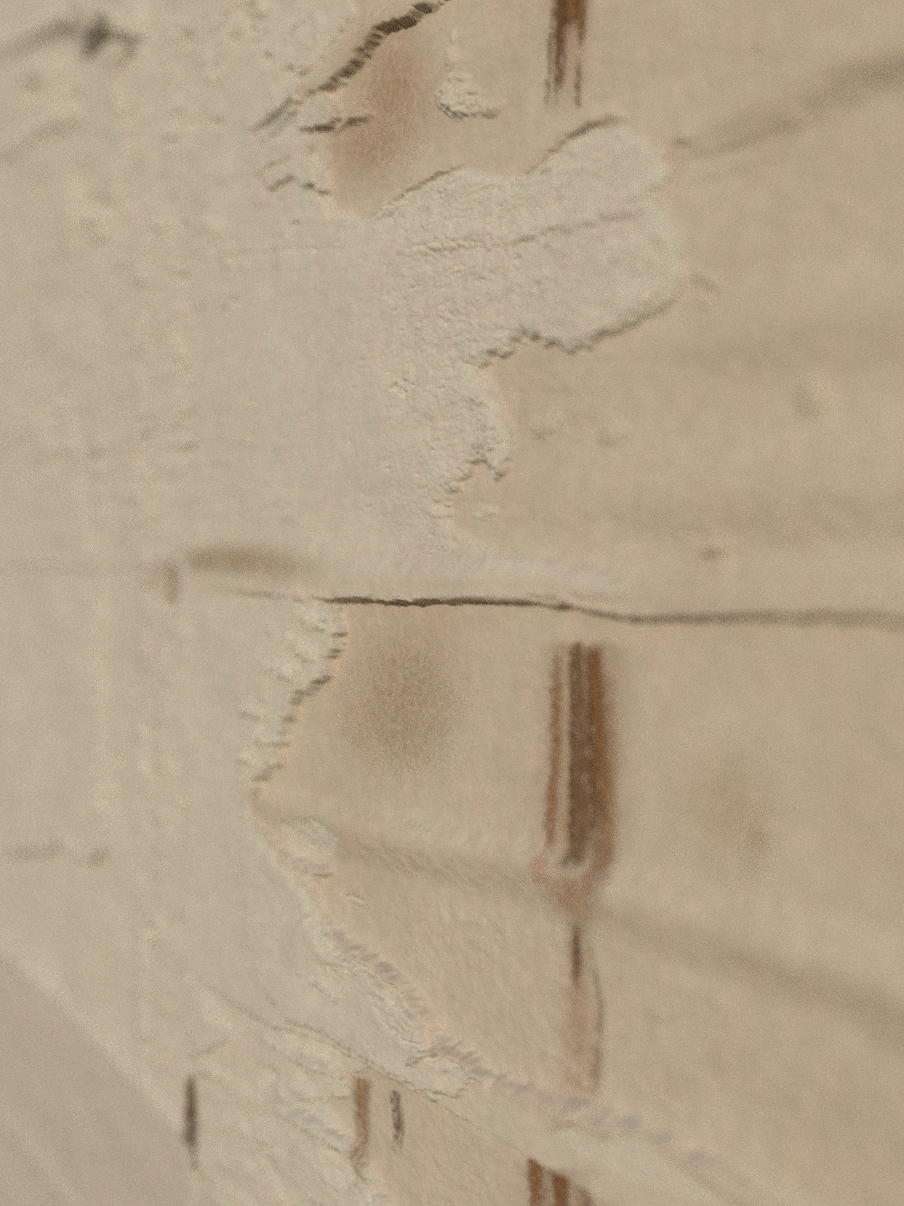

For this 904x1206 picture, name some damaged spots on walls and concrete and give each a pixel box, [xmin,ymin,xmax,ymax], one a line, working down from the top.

rust [554,0,586,102]
flaking render [182,89,692,559]
flaking render [235,589,352,800]
rust [546,644,611,879]
flaking render [182,969,389,1206]
rust [529,1159,567,1206]